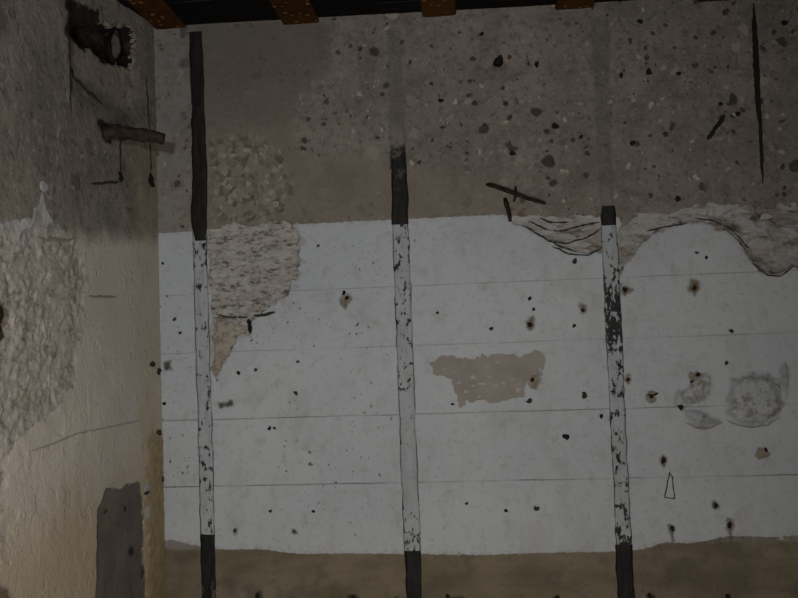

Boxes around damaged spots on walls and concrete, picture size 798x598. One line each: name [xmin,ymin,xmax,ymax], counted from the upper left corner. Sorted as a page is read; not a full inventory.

hole [65,0,137,124]
corrosion [97,119,166,145]
peeling [507,214,602,264]
spalling [617,201,798,277]
spalling [207,220,307,381]
spalling [0,224,90,549]
peeling [429,350,546,408]